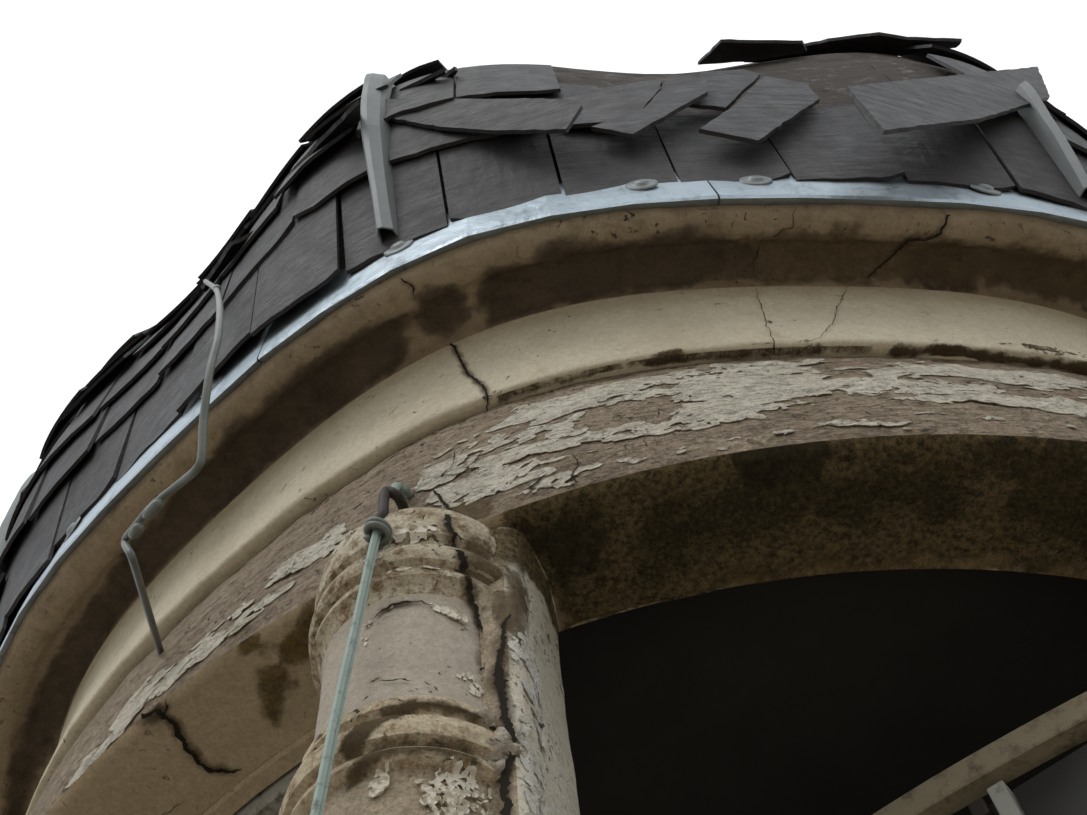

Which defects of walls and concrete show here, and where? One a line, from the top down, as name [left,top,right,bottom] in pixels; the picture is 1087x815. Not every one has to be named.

leakage [479,227,1087,325]
crack [449,343,489,412]
peeling [411,359,1087,509]
crack [141,700,242,774]
peeling [65,523,352,789]
leakage [4,285,480,815]
peeling [368,762,390,798]
crack [374,600,436,618]
peeling [413,756,495,815]
crack [413,450,522,815]
peeling [508,631,547,815]
leakage [634,435,1087,594]